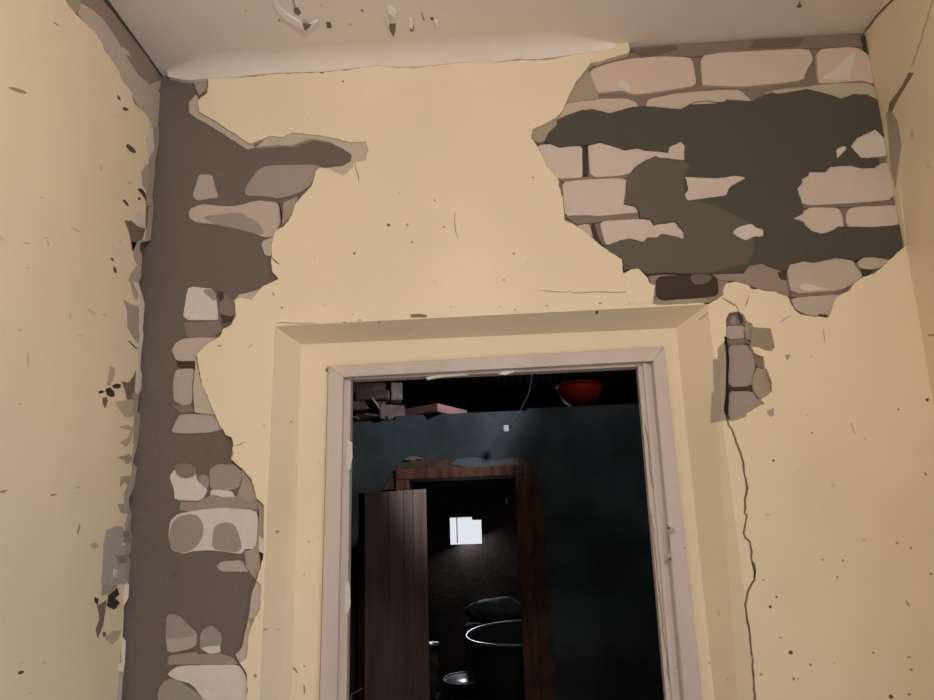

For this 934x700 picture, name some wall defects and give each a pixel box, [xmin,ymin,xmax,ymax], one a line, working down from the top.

flaking render [65,0,368,700]
flaking render [532,33,903,318]
crack [724,337,756,700]
flaking render [711,313,775,423]